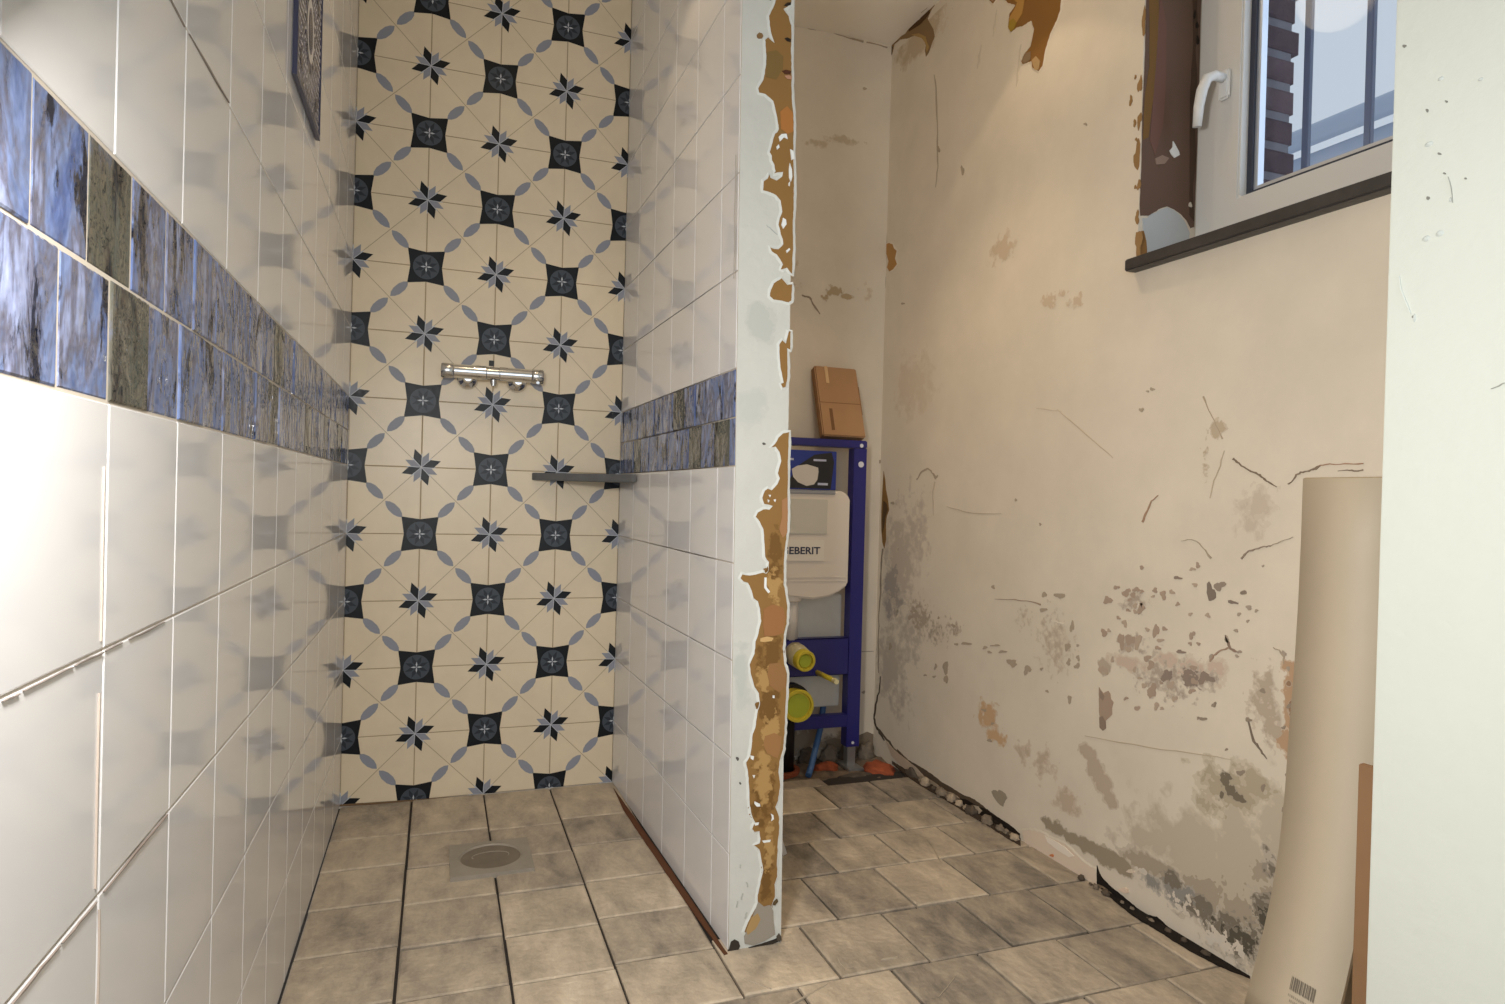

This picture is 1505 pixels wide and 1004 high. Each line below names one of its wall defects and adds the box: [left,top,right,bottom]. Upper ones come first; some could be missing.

spalling [756,0,797,305]
spalling [988,0,1063,74]
spalling [1129,0,1201,256]
spalling [776,329,793,390]
crack [1141,495,1158,523]
crack [1183,537,1293,559]
spalling [727,430,791,951]
water stain [861,468,1291,976]